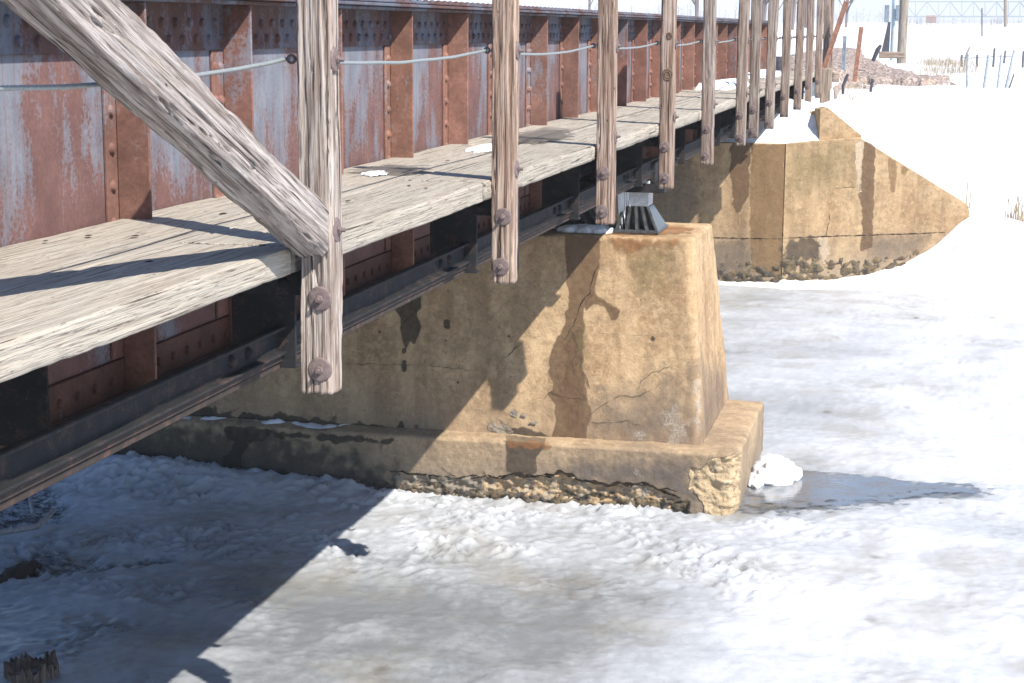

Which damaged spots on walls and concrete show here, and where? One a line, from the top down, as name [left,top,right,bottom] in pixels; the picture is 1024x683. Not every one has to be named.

damp [729,144,830,273]
damp [855,141,876,251]
damp [396,296,421,372]
crack [545,263,677,425]
damp [113,407,417,488]
spalling [356,452,742,516]